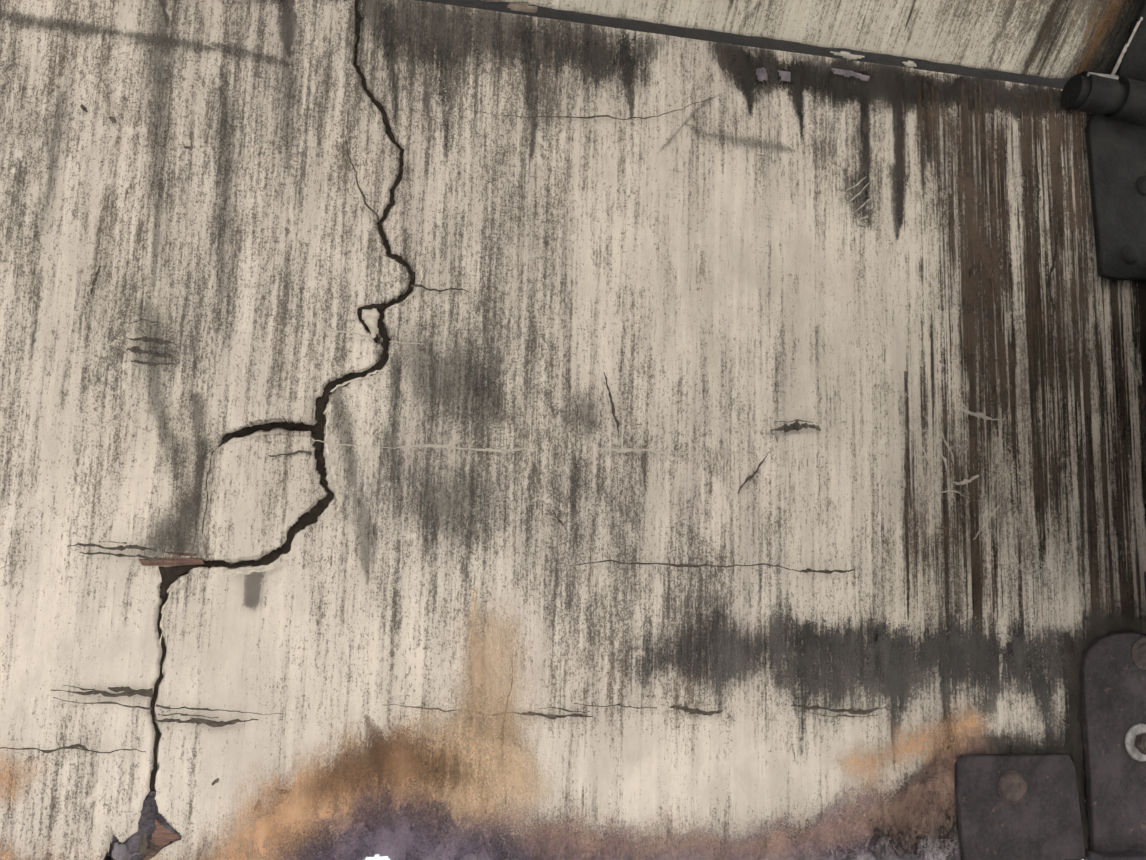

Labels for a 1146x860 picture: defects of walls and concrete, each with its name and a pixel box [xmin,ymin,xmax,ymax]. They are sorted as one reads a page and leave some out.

leakage [141,392,214,561]
crack [0,0,469,792]
leakage [278,0,1146,860]
leakage [244,571,263,609]
spalling [104,791,182,860]